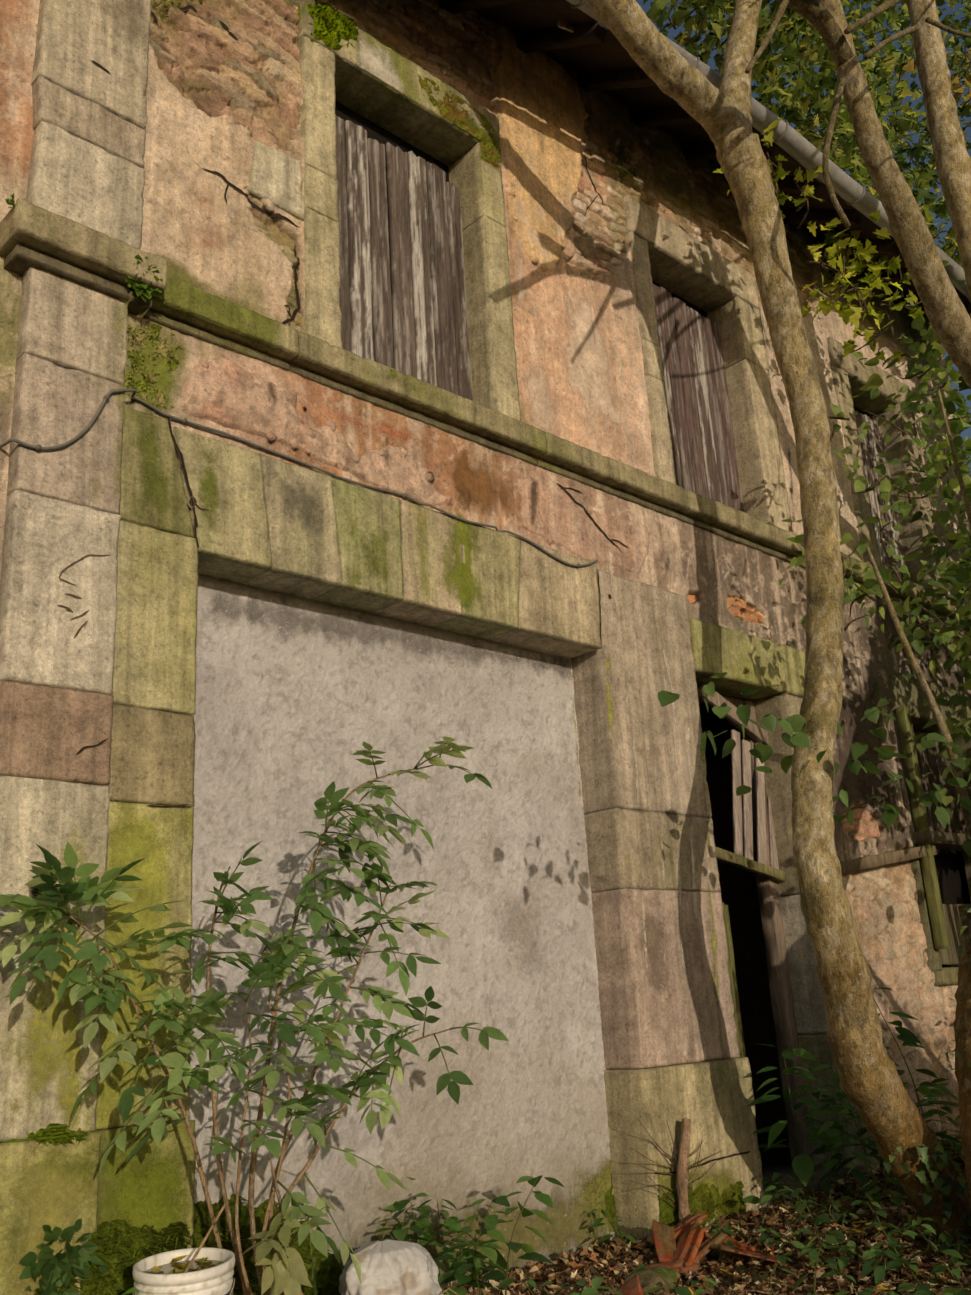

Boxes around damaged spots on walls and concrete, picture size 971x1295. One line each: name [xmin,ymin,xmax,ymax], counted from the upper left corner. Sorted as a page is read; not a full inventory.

flaking render [149,0,304,151]
flaking render [318,0,761,303]
crack [202,168,301,325]
flaking render [241,188,304,332]
flaking render [785,233,814,317]
leakage [286,487,320,532]
crack [557,483,629,549]
crack [595,573,603,639]
spalling [727,597,768,624]